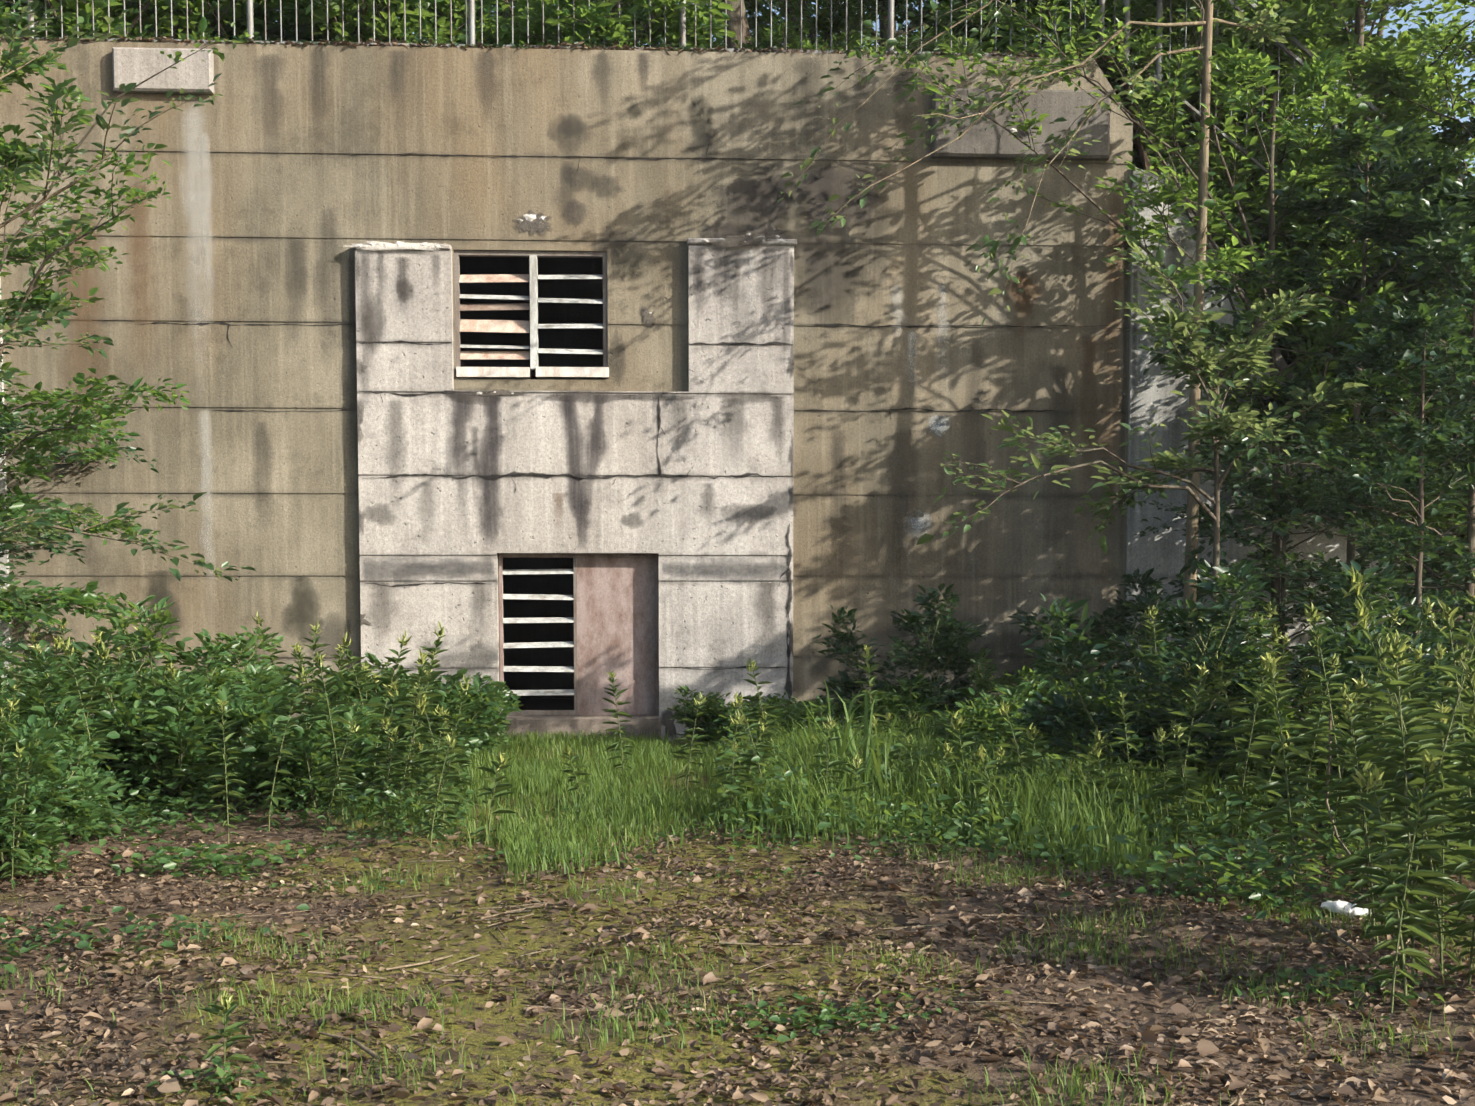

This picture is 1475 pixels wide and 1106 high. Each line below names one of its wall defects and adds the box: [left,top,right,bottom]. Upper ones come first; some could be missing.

spalling [516,211,550,235]
damp [399,260,408,297]
damp [451,390,499,534]
crack [364,397,787,494]